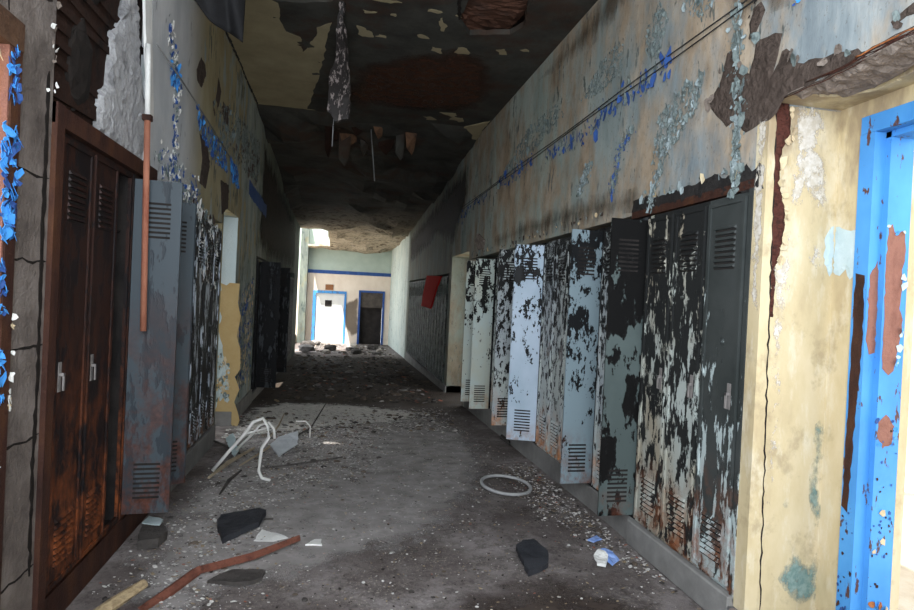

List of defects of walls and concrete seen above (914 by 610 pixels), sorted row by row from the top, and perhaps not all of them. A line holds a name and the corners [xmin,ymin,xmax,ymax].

flaking render [93,0,145,159]
peeling [458,2,674,222]
crack [759,113,777,610]
corrosion [841,273,865,512]
leakage [782,558,815,599]